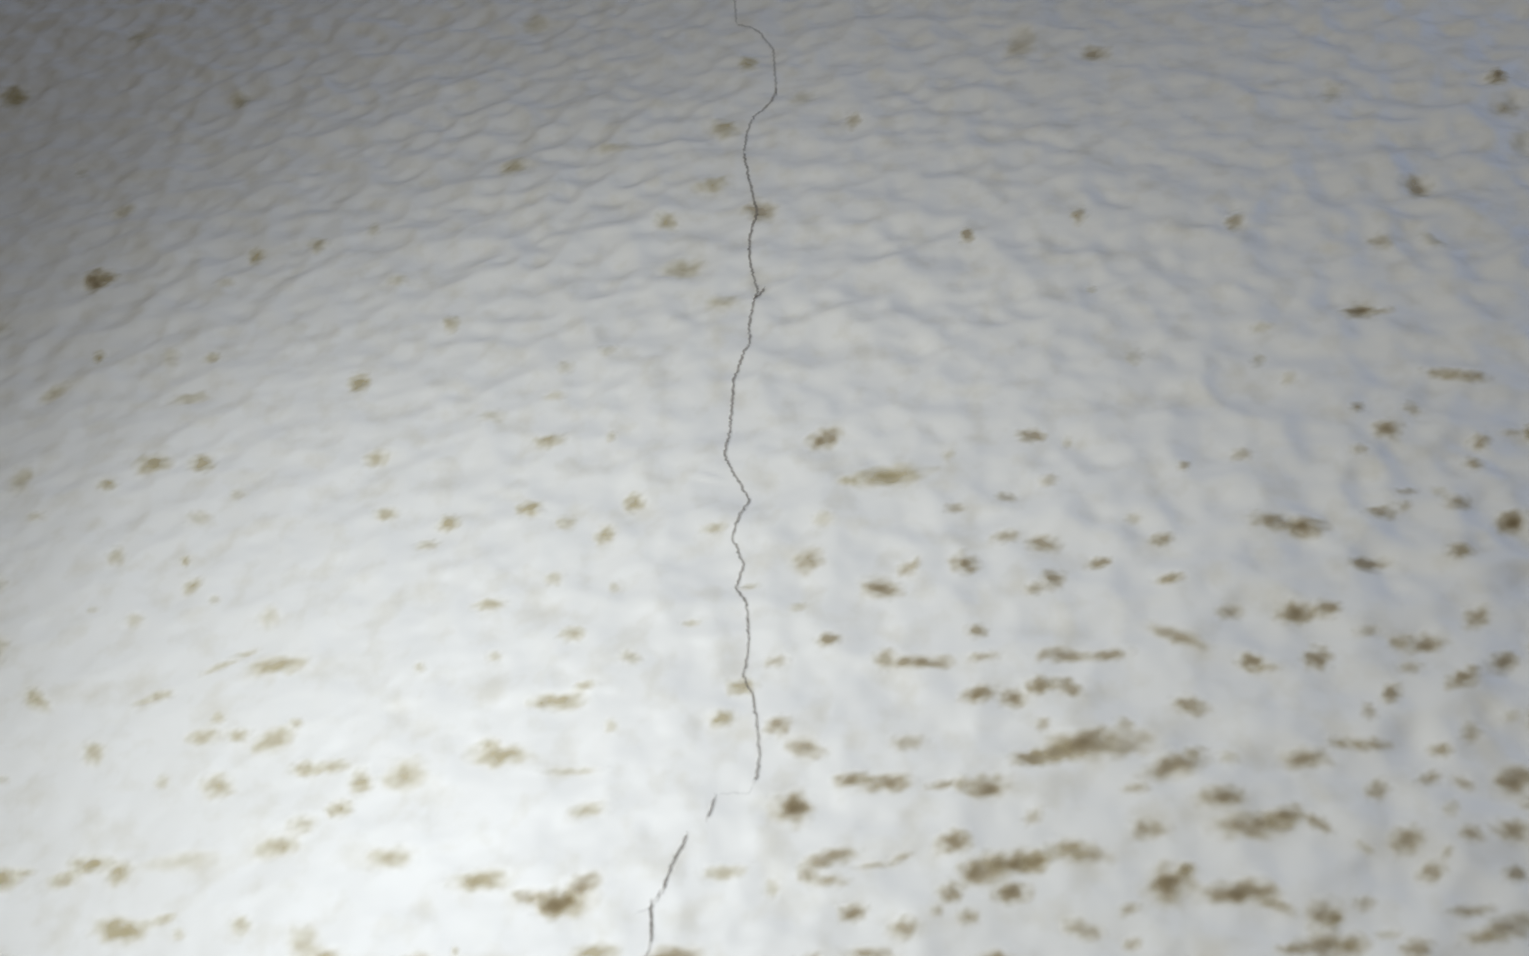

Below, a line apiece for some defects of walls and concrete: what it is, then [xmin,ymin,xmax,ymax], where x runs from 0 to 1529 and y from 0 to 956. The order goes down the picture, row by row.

crack [724,135,764,779]
crack [649,798,715,942]